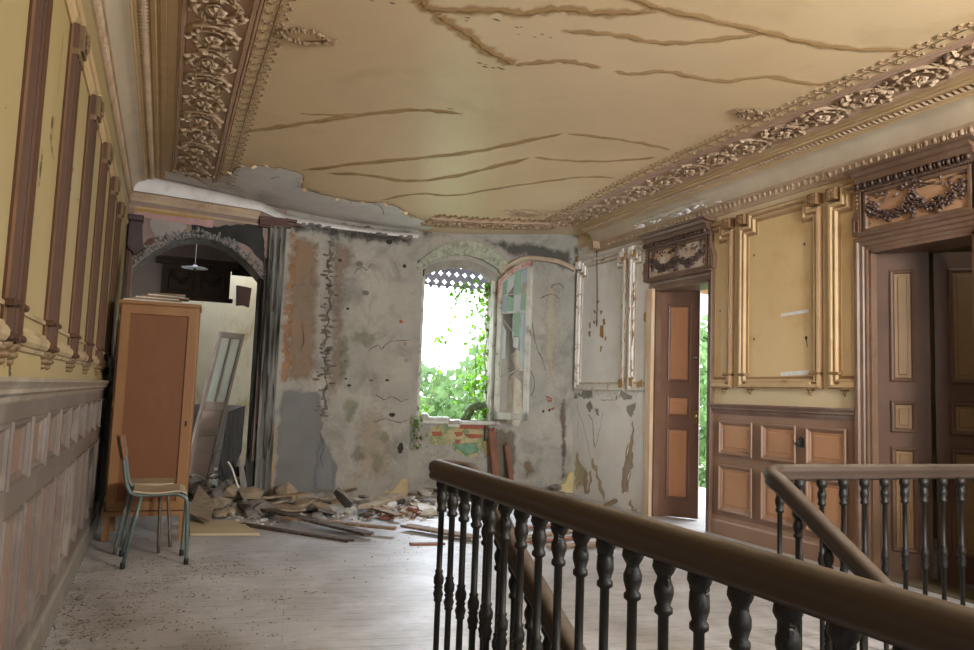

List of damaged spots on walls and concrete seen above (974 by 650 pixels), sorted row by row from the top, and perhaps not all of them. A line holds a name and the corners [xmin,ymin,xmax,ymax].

flaking render [165,164,434,244]
flaking render [312,241,363,417]
peeling [588,301,607,352]
peeling [621,249,661,342]
peeling [618,355,642,387]